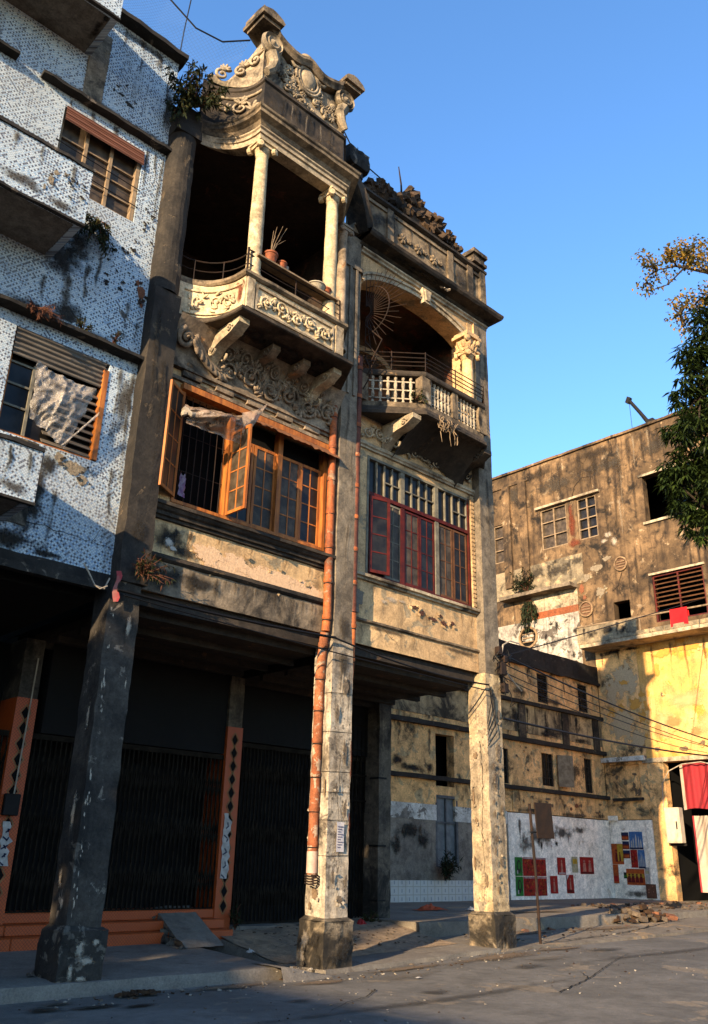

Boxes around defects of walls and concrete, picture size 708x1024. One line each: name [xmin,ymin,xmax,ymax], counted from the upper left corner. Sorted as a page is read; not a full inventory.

spalling [55,452,91,485]
water stain [510,441,634,511]
water stain [135,522,195,558]
corrosion [569,507,579,547]
water stain [151,568,236,594]
water stain [531,558,582,579]
peeling [410,604,456,628]
spalling [69,769,92,829]
mould [391,823,428,854]
spalling [331,870,347,907]
spalling [68,936,99,981]